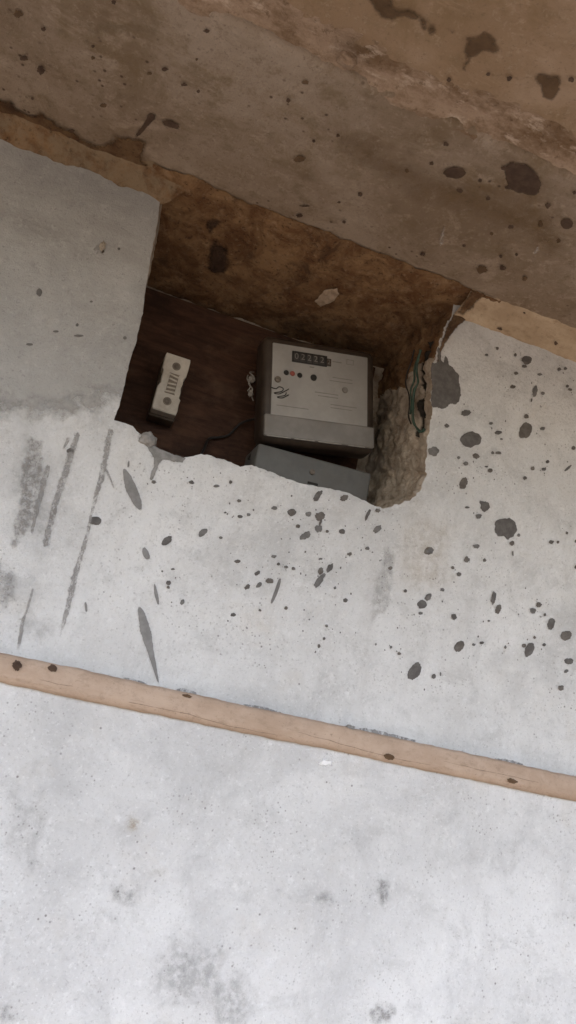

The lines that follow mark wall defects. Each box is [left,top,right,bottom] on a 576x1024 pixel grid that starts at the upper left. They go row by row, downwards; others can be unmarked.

leakage [370,0,435,34]
leakage [463,33,499,70]
leakage [501,162,551,209]
peeling [315,288,339,307]
leakage [431,347,506,489]
leakage [13,433,79,546]
leakage [63,430,156,623]
leakage [154,568,185,607]
leakage [18,591,33,644]